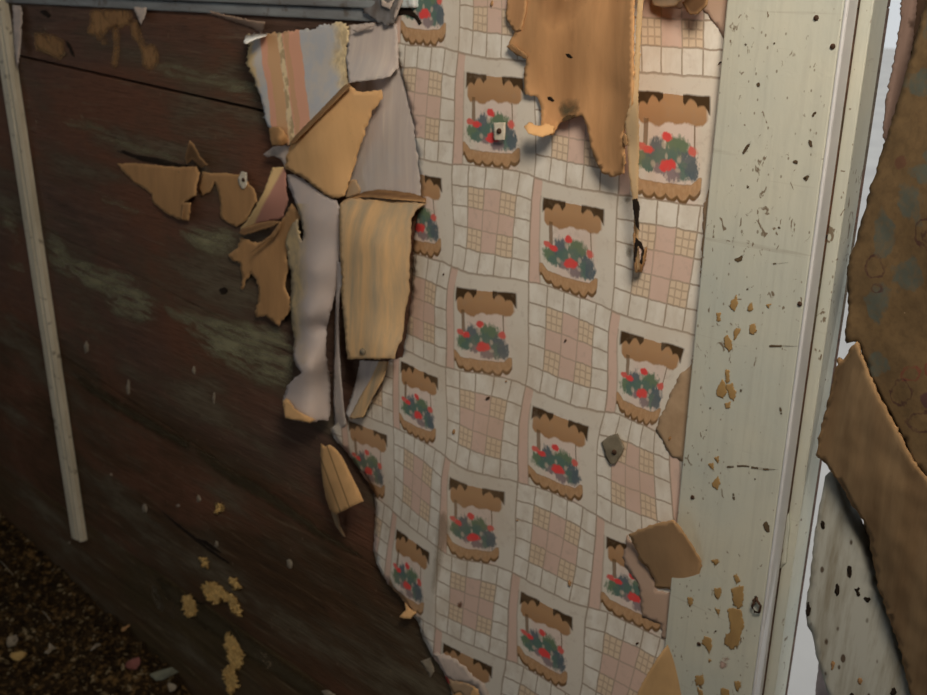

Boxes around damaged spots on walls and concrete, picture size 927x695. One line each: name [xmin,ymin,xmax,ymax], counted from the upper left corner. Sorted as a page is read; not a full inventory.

peeling [505,0,708,203]
peeling [633,218,647,273]
peeling [283,174,427,428]
peeling [716,295,753,322]
peeling [723,323,757,352]
peeling [716,369,742,409]
peeling [708,456,720,490]
peeling [629,520,720,589]
peeling [700,574,744,668]
peeling [637,644,681,695]
peeling [695,674,705,695]
peeling [720,680,742,695]